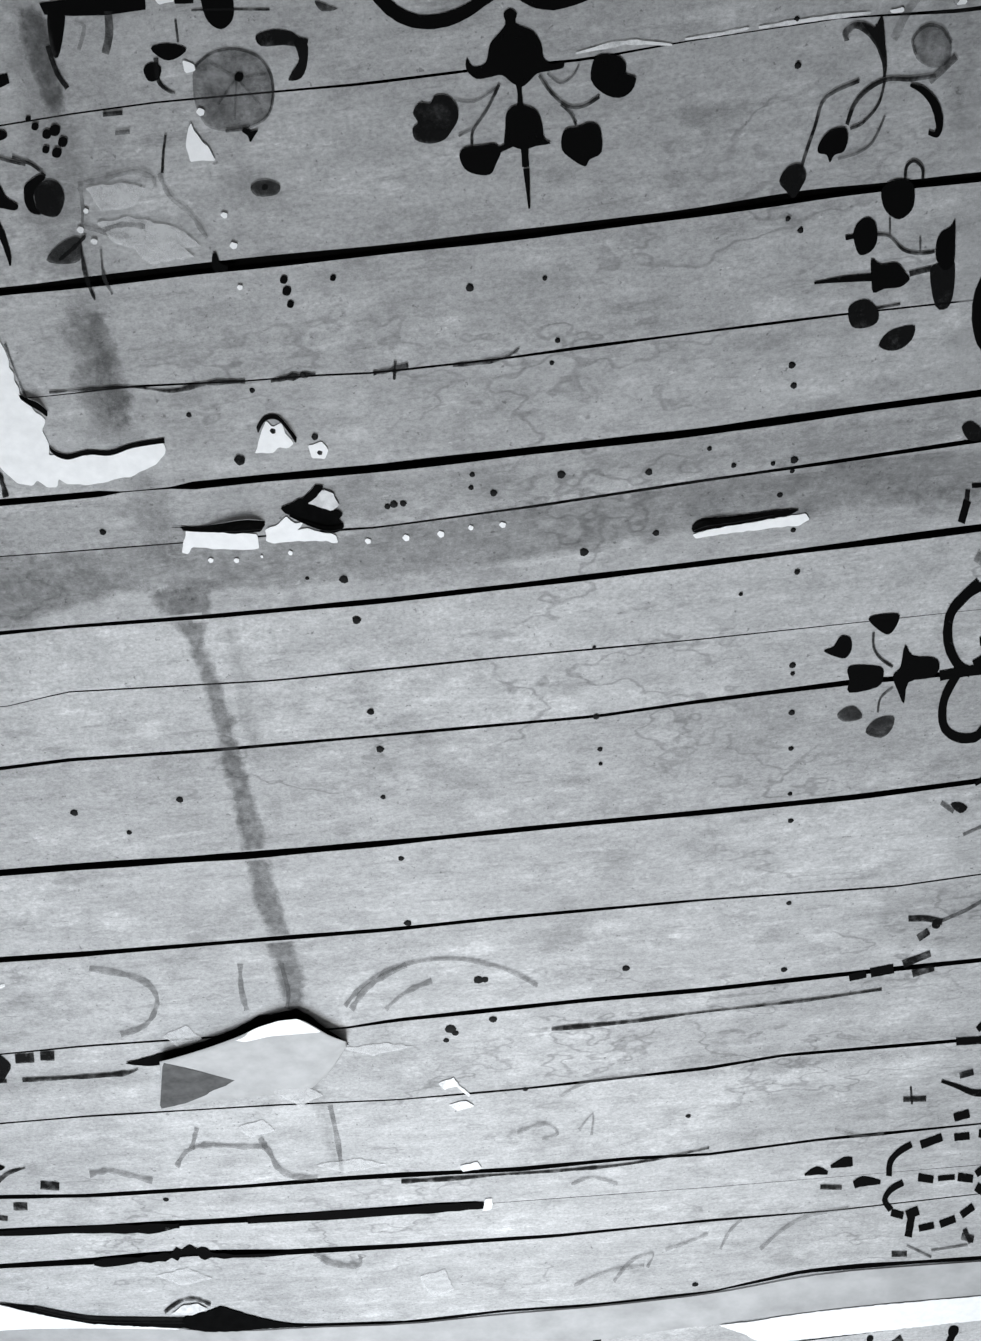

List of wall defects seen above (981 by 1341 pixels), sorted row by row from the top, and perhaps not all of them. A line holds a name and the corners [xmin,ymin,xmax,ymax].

peeling [0,342,166,488]
peeling [234,414,328,466]
peeling [172,485,344,563]
peeling [692,509,809,538]
peeling [0,1297,304,1332]
peeling [719,1296,981,1341]